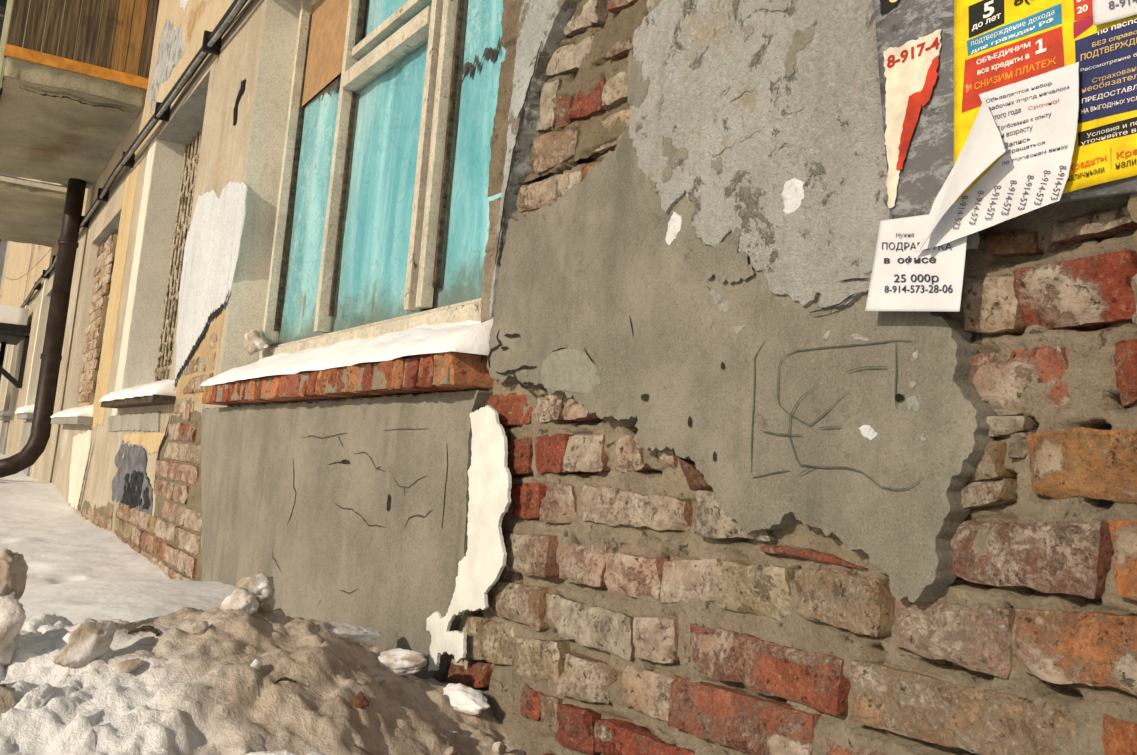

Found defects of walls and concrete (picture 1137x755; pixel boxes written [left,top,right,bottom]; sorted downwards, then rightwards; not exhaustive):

spalling [481,0,522,323]
peeling [516,0,892,312]
spalling [68,181,248,582]
crack [287,464,296,525]
crack [302,433,448,528]
crack [488,330,595,389]
spalling [426,193,1137,755]